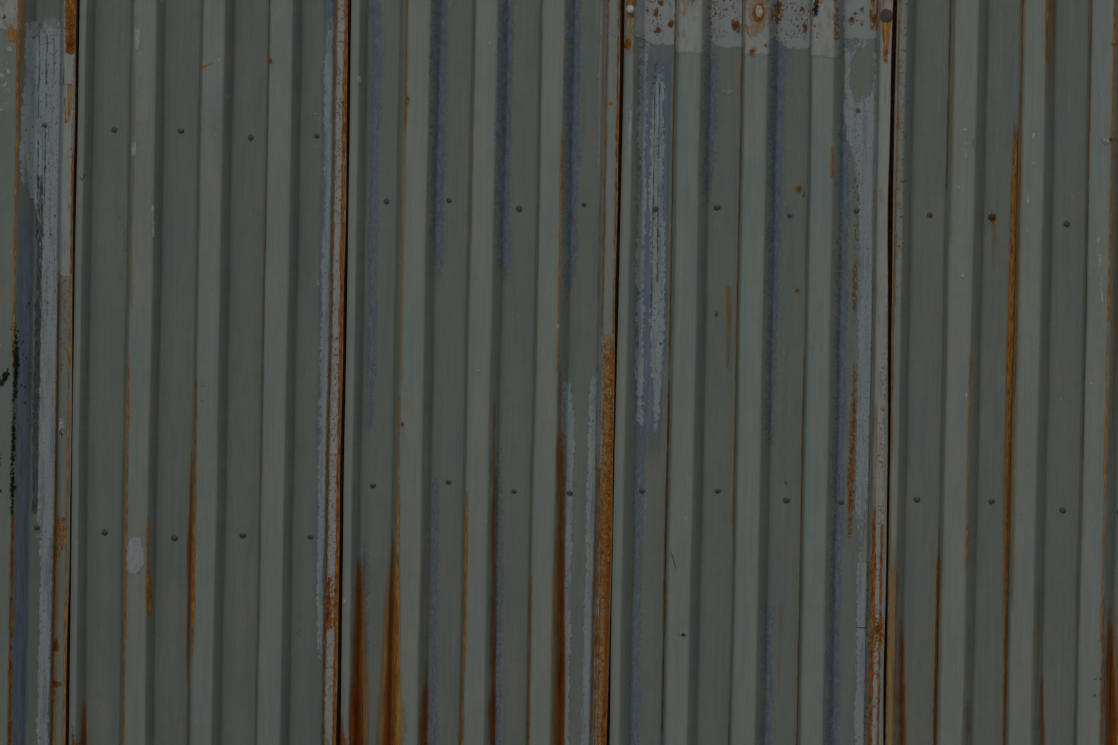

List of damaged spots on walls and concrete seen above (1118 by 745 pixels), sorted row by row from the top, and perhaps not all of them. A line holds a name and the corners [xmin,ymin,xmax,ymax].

peeling [0,0,75,745]
corrosion [50,153,86,745]
corrosion [65,0,76,55]
corrosion [322,0,406,745]
corrosion [590,0,620,745]
peeling [624,0,893,745]
corrosion [847,0,908,544]
corrosion [856,498,906,745]